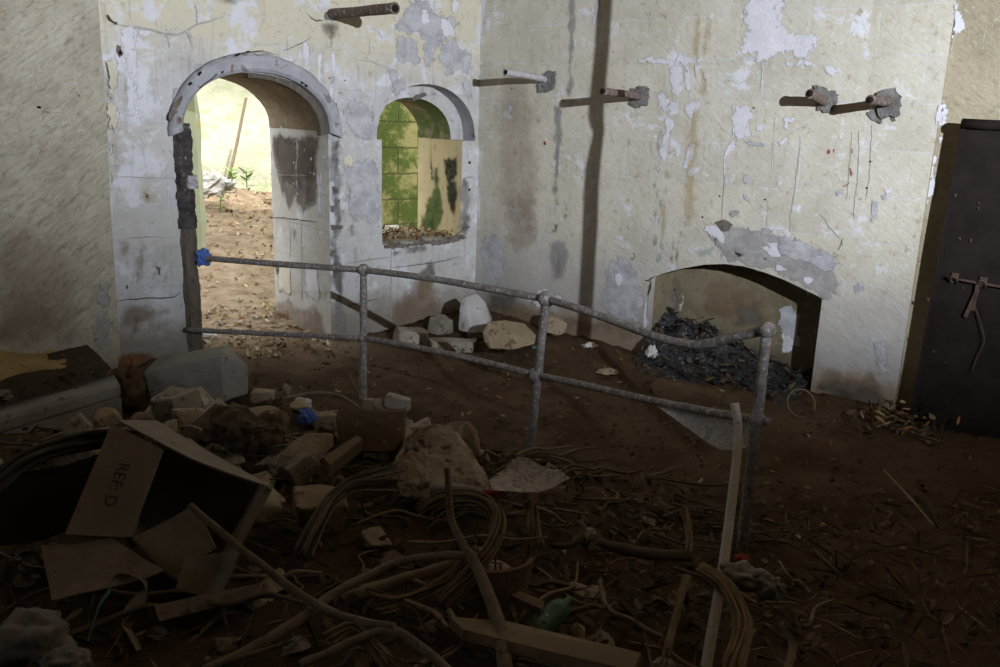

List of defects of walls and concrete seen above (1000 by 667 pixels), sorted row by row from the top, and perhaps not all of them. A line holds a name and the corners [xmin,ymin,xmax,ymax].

crack [107,3,221,50]
flaking render [168,95,183,121]
peeling [301,42,383,230]
peeling [389,0,486,125]
peeling [638,0,839,177]
flaking render [703,104,843,300]